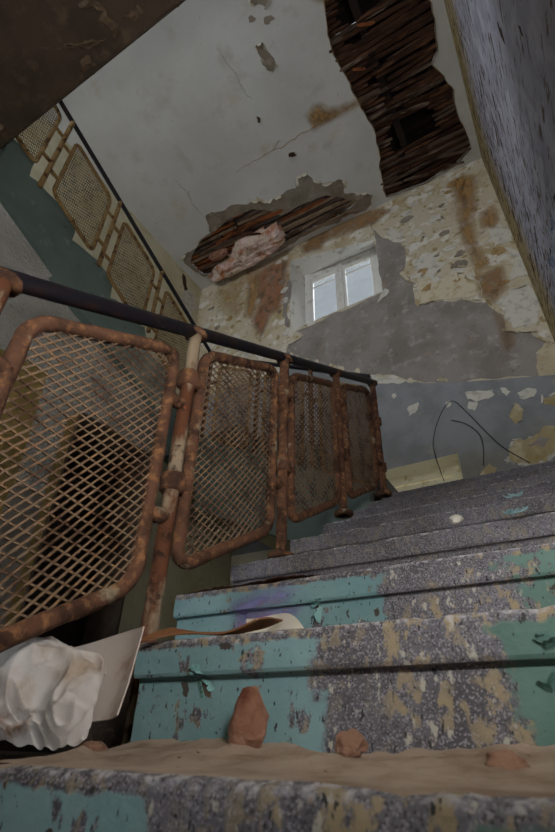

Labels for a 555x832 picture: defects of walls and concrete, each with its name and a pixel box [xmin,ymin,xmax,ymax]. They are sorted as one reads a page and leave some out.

peeling [248,0,275,25]
peeling [253,42,278,73]
spalling [178,172,373,282]
peeling [277,65,555,424]
damp [454,176,503,300]
damp [247,262,286,334]
peeling [504,426,555,466]
peeling [533,633,555,650]
spalling [181,664,215,700]
peeling [535,670,555,693]